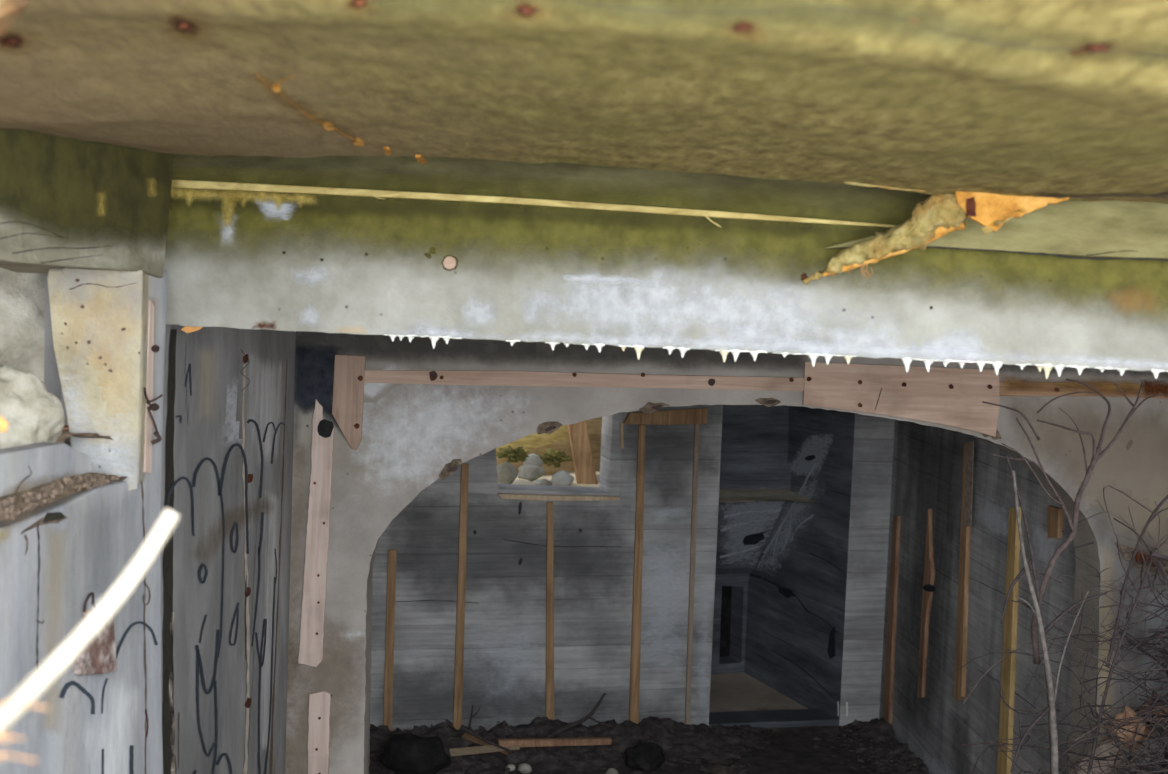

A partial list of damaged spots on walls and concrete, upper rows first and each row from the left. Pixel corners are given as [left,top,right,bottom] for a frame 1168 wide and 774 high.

rust [1071,44,1111,55]
spalling [844,182,926,192]
spalling [954,192,1070,234]
leakage [185,276,1168,755]
leakage [917,745,965,774]